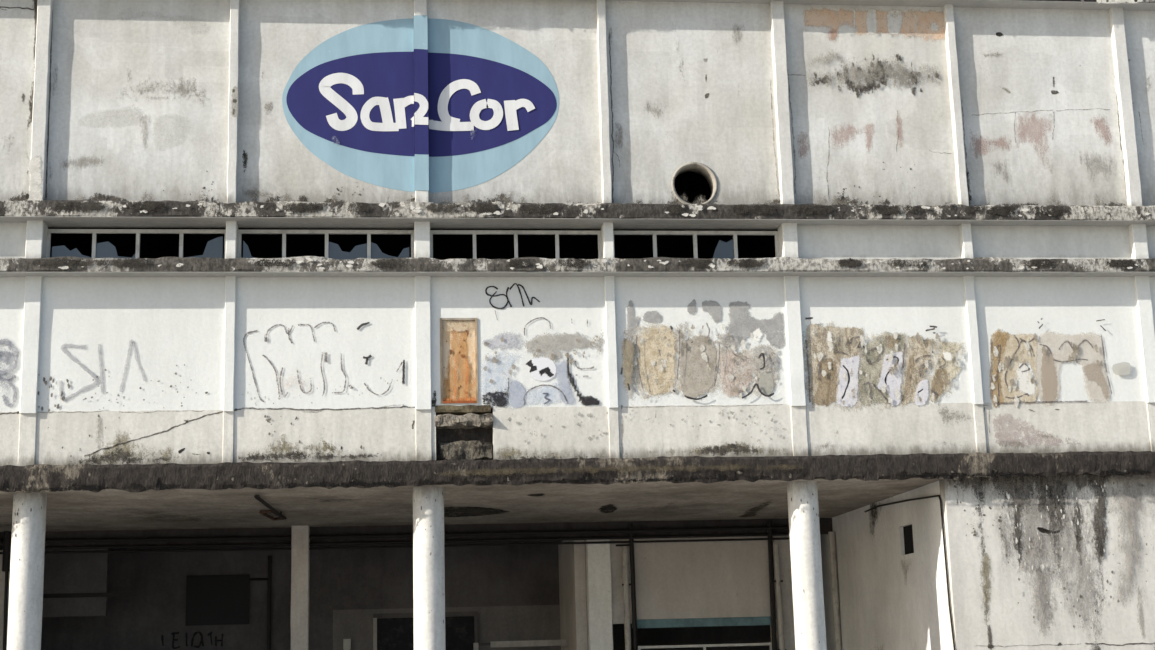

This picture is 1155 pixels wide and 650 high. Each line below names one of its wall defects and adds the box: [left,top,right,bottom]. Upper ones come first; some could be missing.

damp [811,53,939,98]
damp [80,193,127,201]
damp [245,190,308,203]
peeling [533,335,598,365]
peeling [626,300,662,365]
peeling [651,299,785,442]
peeling [991,333,1046,408]
peeling [1061,342,1103,366]
crack [0,405,415,457]
damp [701,442,758,456]
damp [947,475,1152,649]